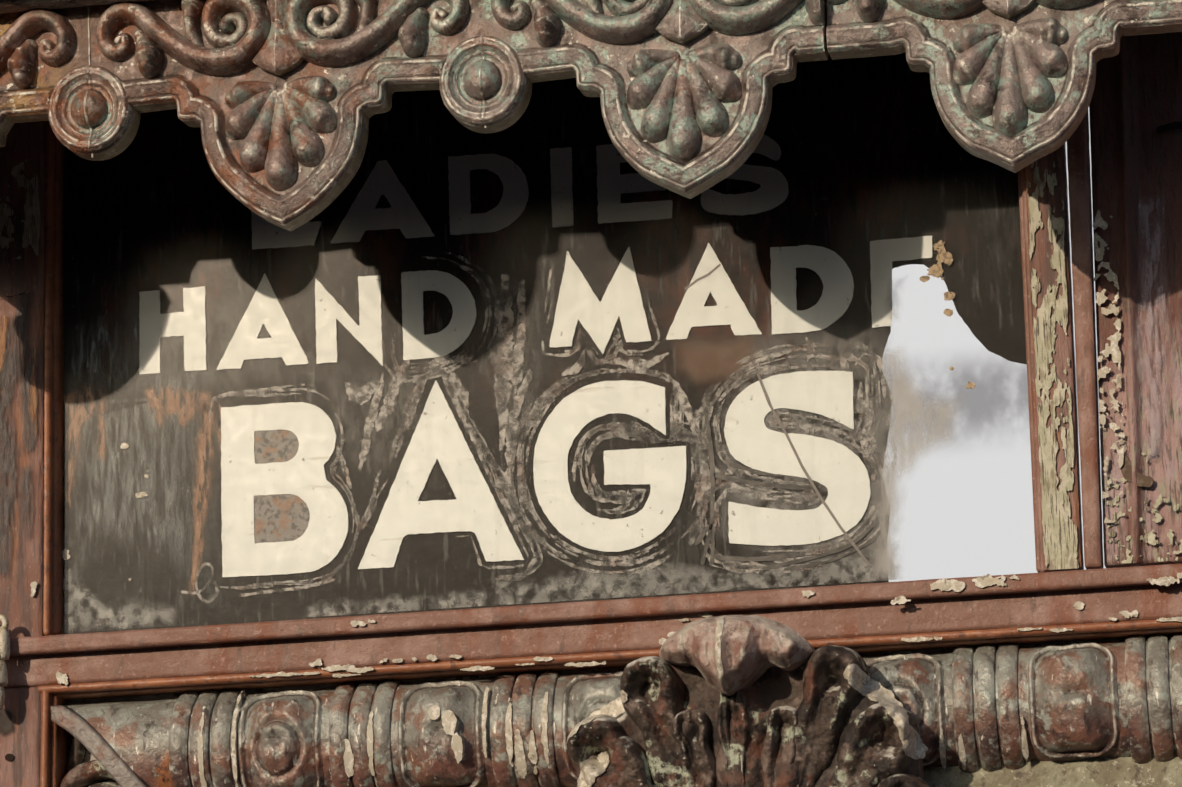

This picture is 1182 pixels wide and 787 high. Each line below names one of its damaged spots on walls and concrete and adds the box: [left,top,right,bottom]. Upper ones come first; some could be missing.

peeling [1027,160,1079,570]
peeling [1093,210,1182,586]
peeling [930,574,1019,592]
peeling [249,654,495,678]
peeling [515,657,607,667]
peeling [231,691,245,787]
peeling [343,711,375,777]
peeling [428,705,465,763]
peeling [505,692,549,779]
peeling [577,751,610,787]
peeling [567,690,628,742]
peeling [843,664,966,770]